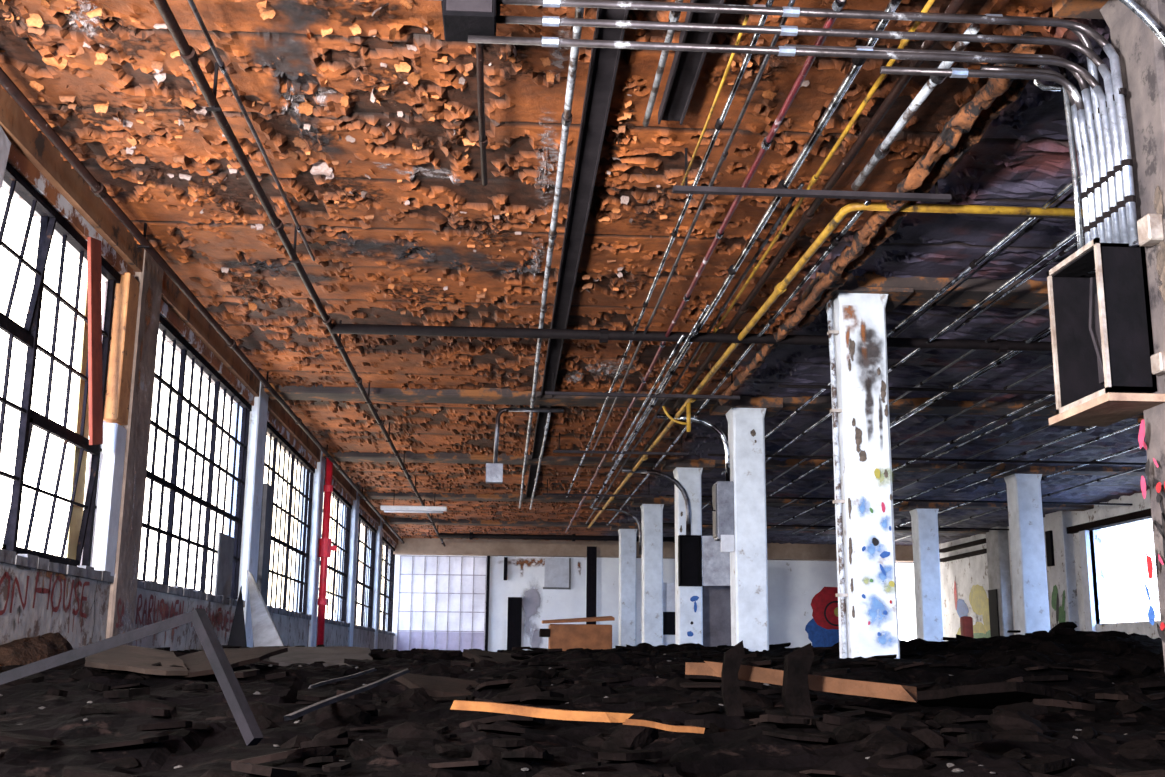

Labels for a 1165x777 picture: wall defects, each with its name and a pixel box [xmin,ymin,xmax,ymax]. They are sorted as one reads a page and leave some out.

peeling [256,0,275,20]
peeling [459,24,555,85]
peeling [728,39,808,102]
peeling [0,0,268,231]
peeling [264,0,476,220]
peeling [606,83,637,175]
peeling [445,206,536,259]
peeling [598,172,694,238]
peeling [220,267,276,311]
peeling [377,273,487,315]
peeling [578,260,647,297]
spalling [852,418,867,462]